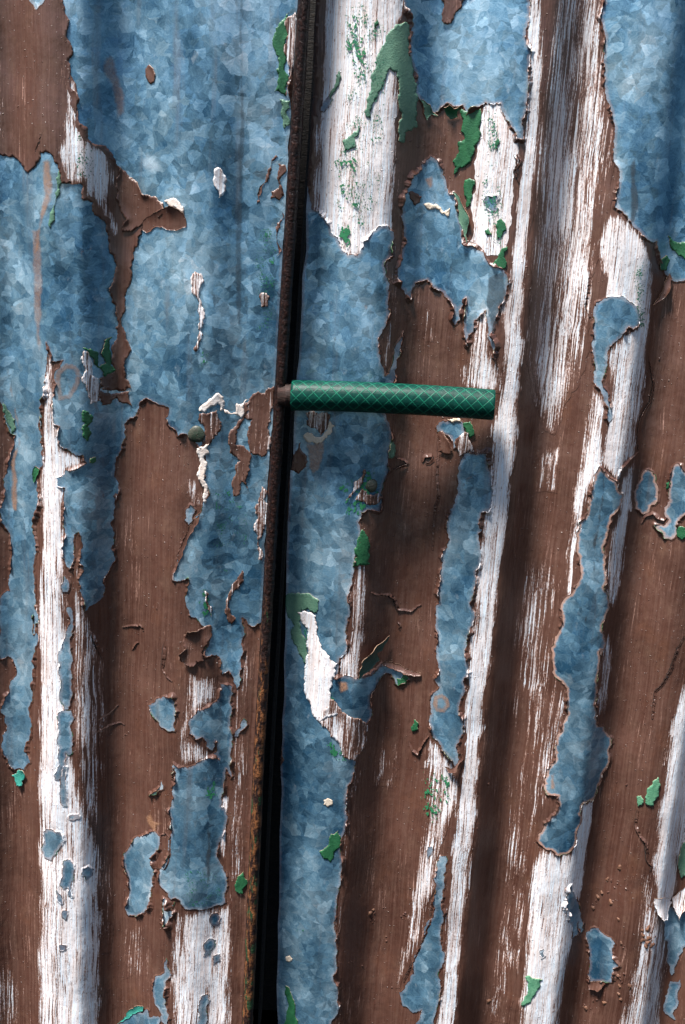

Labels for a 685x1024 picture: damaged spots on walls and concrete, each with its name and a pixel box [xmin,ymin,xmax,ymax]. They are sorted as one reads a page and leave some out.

peeling [0,0,298,1024]
peeling [277,0,685,1024]